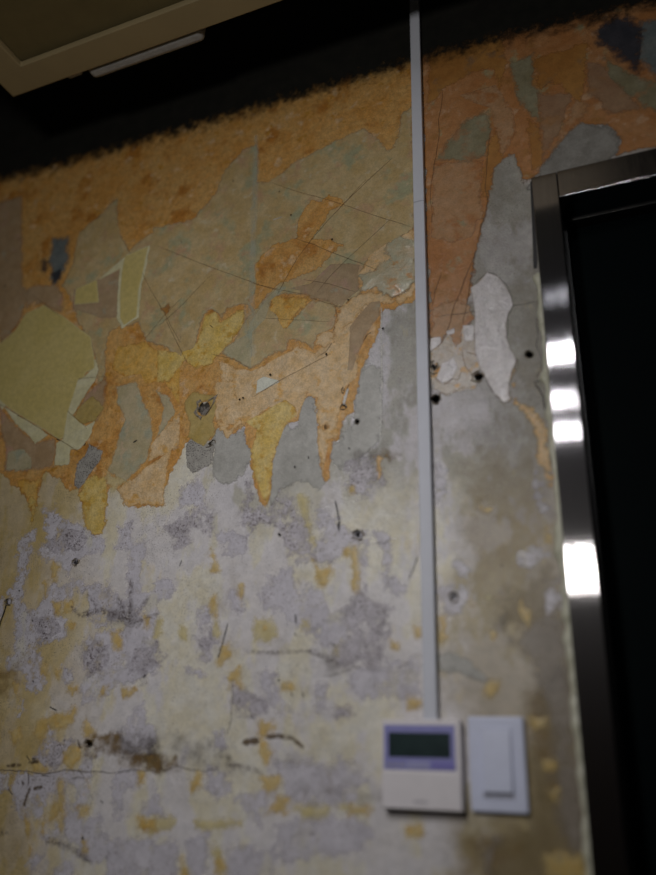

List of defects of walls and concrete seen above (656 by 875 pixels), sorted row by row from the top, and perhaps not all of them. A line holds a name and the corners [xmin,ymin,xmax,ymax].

leakage [597,17,656,74]
flaking render [42,238,69,284]
flaking render [74,444,103,489]
flaking render [118,282,423,700]
flaking render [0,478,176,718]
leakage [84,721,120,757]
flaking render [0,726,140,864]
crack [5,766,217,779]
leakage [131,754,177,783]